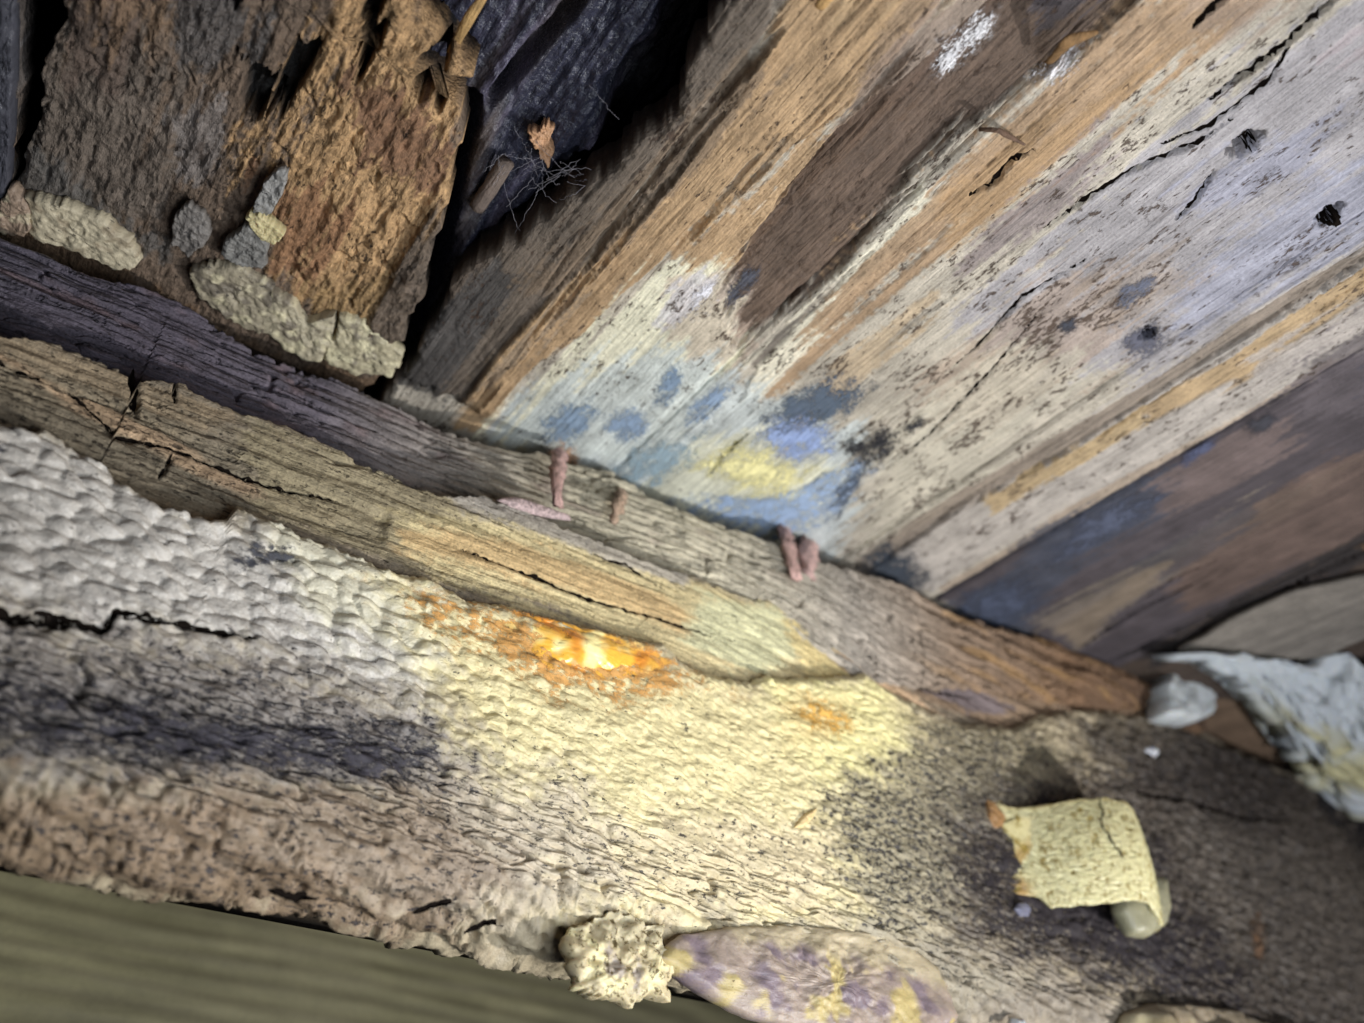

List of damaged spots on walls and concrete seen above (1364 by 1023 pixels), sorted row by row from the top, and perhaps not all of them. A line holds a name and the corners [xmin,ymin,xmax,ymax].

crack [1043,0,1328,228]
crack [0,607,258,640]
peeling [992,797,1171,938]